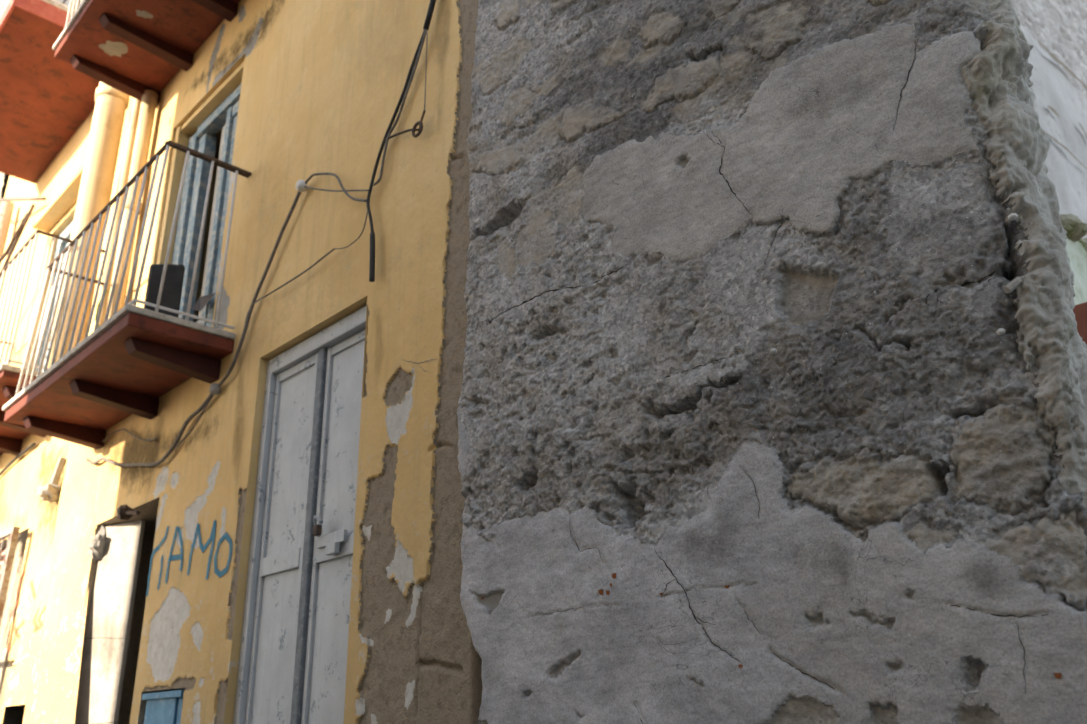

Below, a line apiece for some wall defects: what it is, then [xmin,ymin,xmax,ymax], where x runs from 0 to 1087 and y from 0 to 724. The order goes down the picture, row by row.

crack [893,39,918,130]
crack [708,134,749,212]
spalling [355,0,1087,724]
peeling [143,586,204,724]
peeling [214,678,228,724]
crack [654,549,740,662]